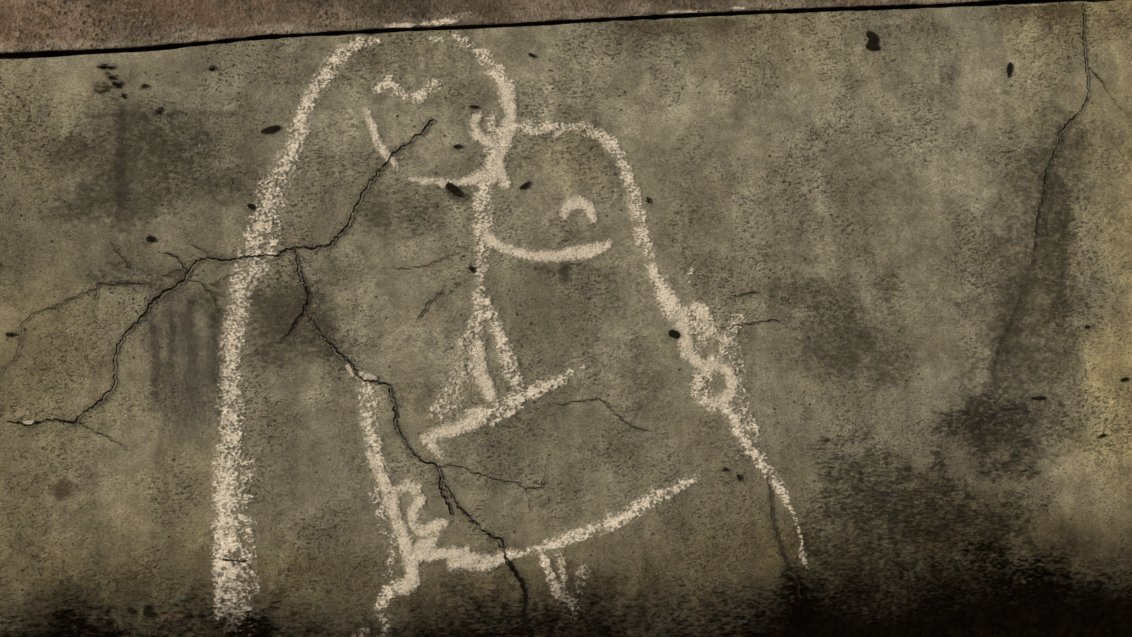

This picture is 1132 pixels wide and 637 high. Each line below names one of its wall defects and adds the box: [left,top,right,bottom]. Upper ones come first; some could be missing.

crack [1033,3,1121,252]
leakage [1,594,348,637]
crack [0,118,548,624]
leakage [369,432,1132,637]
leakage [933,393,1038,481]
crack [992,295,1022,379]